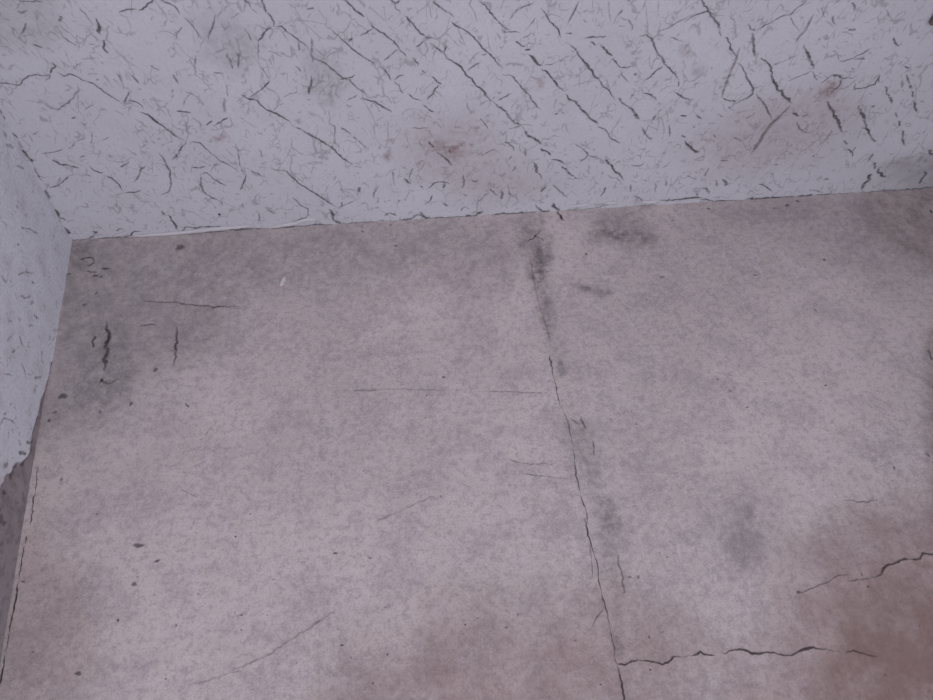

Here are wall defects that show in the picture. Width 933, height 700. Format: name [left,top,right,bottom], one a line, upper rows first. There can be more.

crack [0,65,360,241]
crack [244,0,298,41]
crack [299,1,701,220]
crack [666,173,828,202]
crack [696,0,803,127]
crack [828,50,916,191]
crack [575,471,874,700]
crack [808,553,933,590]